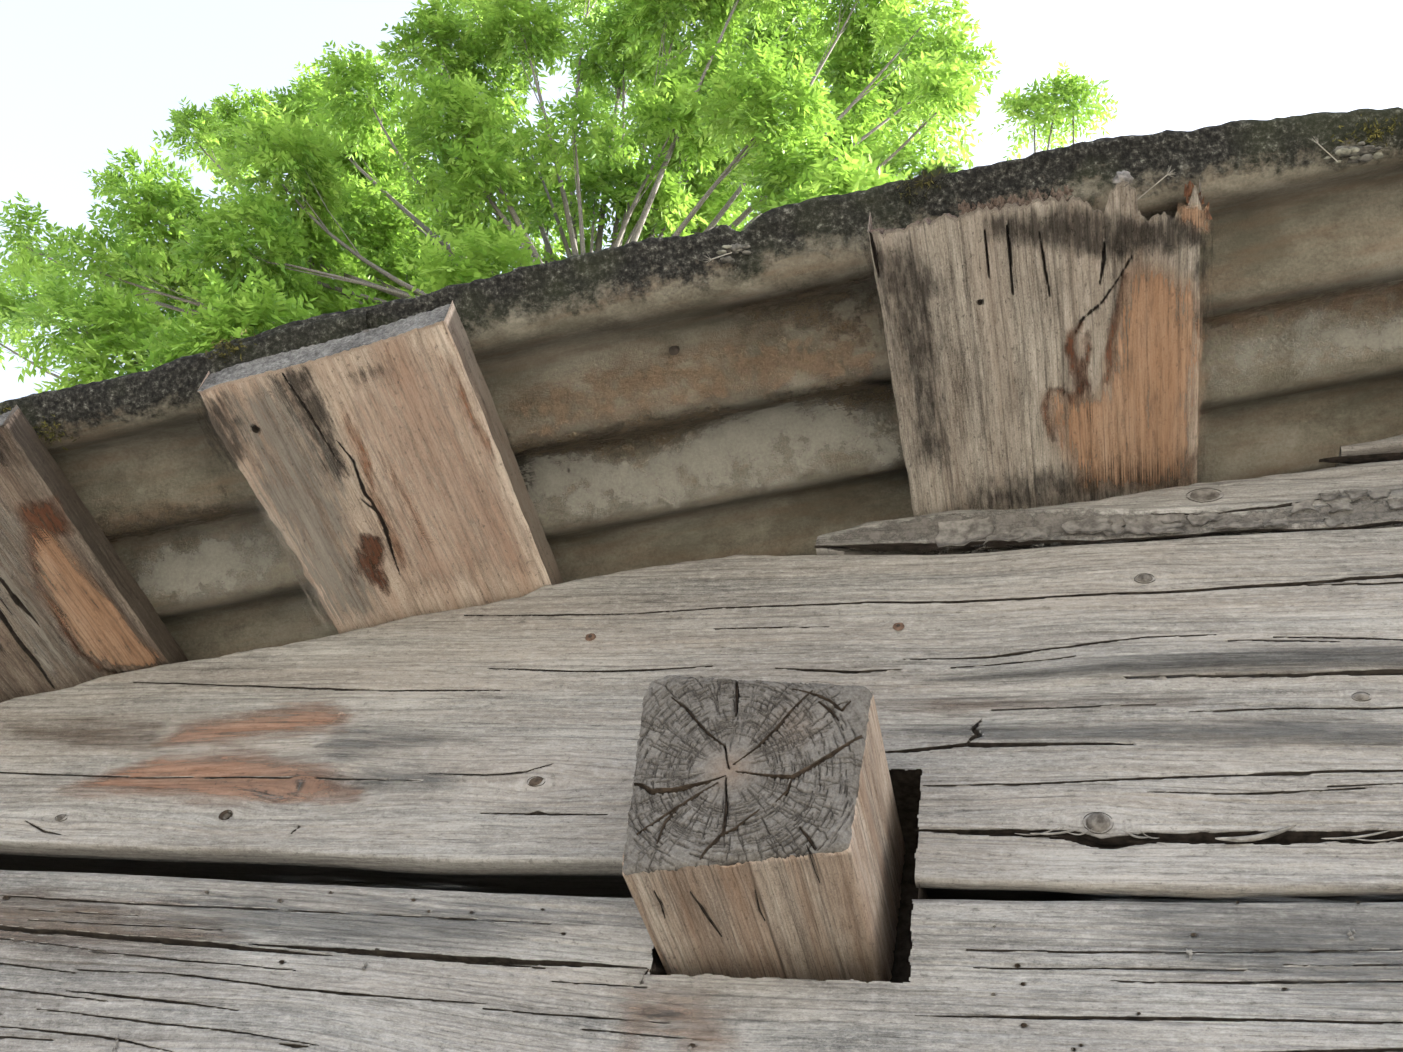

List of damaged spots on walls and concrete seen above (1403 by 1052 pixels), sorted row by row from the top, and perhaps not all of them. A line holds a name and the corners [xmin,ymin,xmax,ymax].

crack [1075,243,1132,334]
water stain [969,206,1403,509]
crack [282,373,400,575]
crack [464,488,1403,630]
peeling [1319,489,1403,528]
crack [0,577,55,689]
crack [25,815,67,835]
crack [0,764,608,815]
crack [133,634,1403,860]
crack [799,826,820,883]
crack [654,890,722,937]
crack [0,895,706,1052]